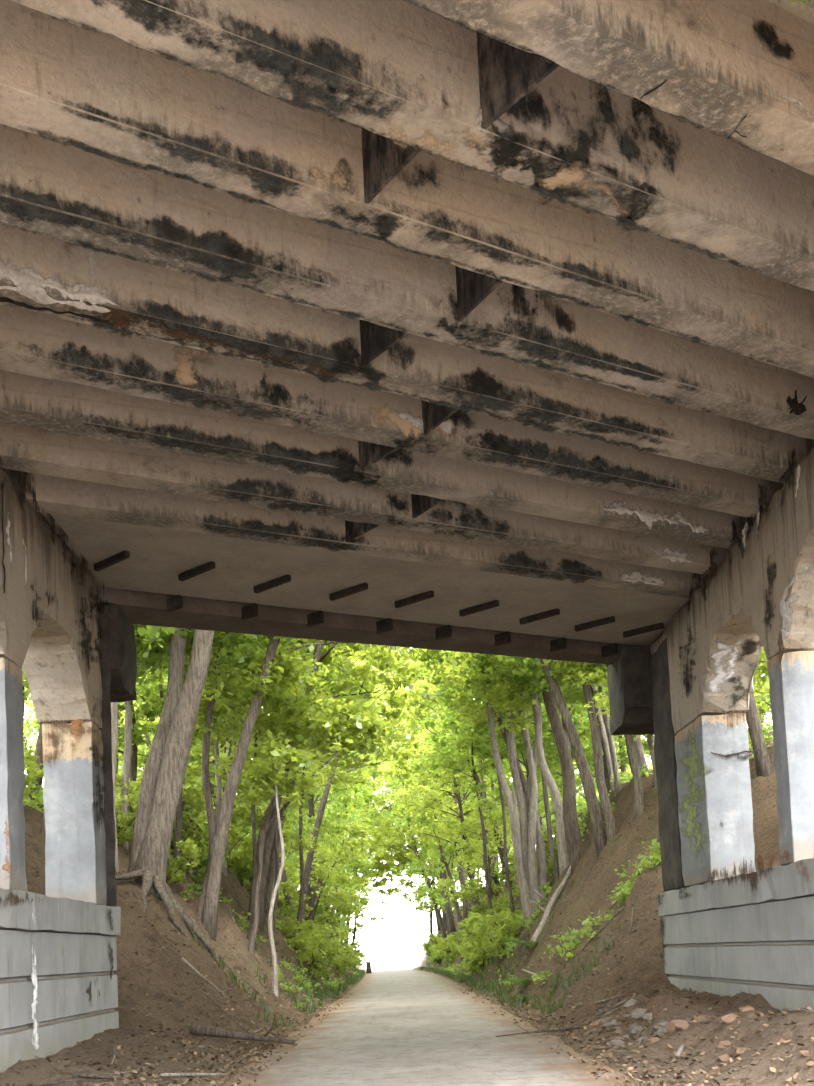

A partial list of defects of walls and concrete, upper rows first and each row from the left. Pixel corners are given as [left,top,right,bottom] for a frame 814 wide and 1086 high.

damp [753,20,793,59]
damp [30,101,309,213]
damp [93,0,749,268]
spalling [0,259,120,324]
damp [0,185,706,390]
damp [29,300,675,491]
crack [0,483,8,593]
damp [202,478,369,551]
spalling [620,571,665,586]
spalling [602,501,707,533]
spalling [777,563,814,664]
spalling [707,638,760,706]